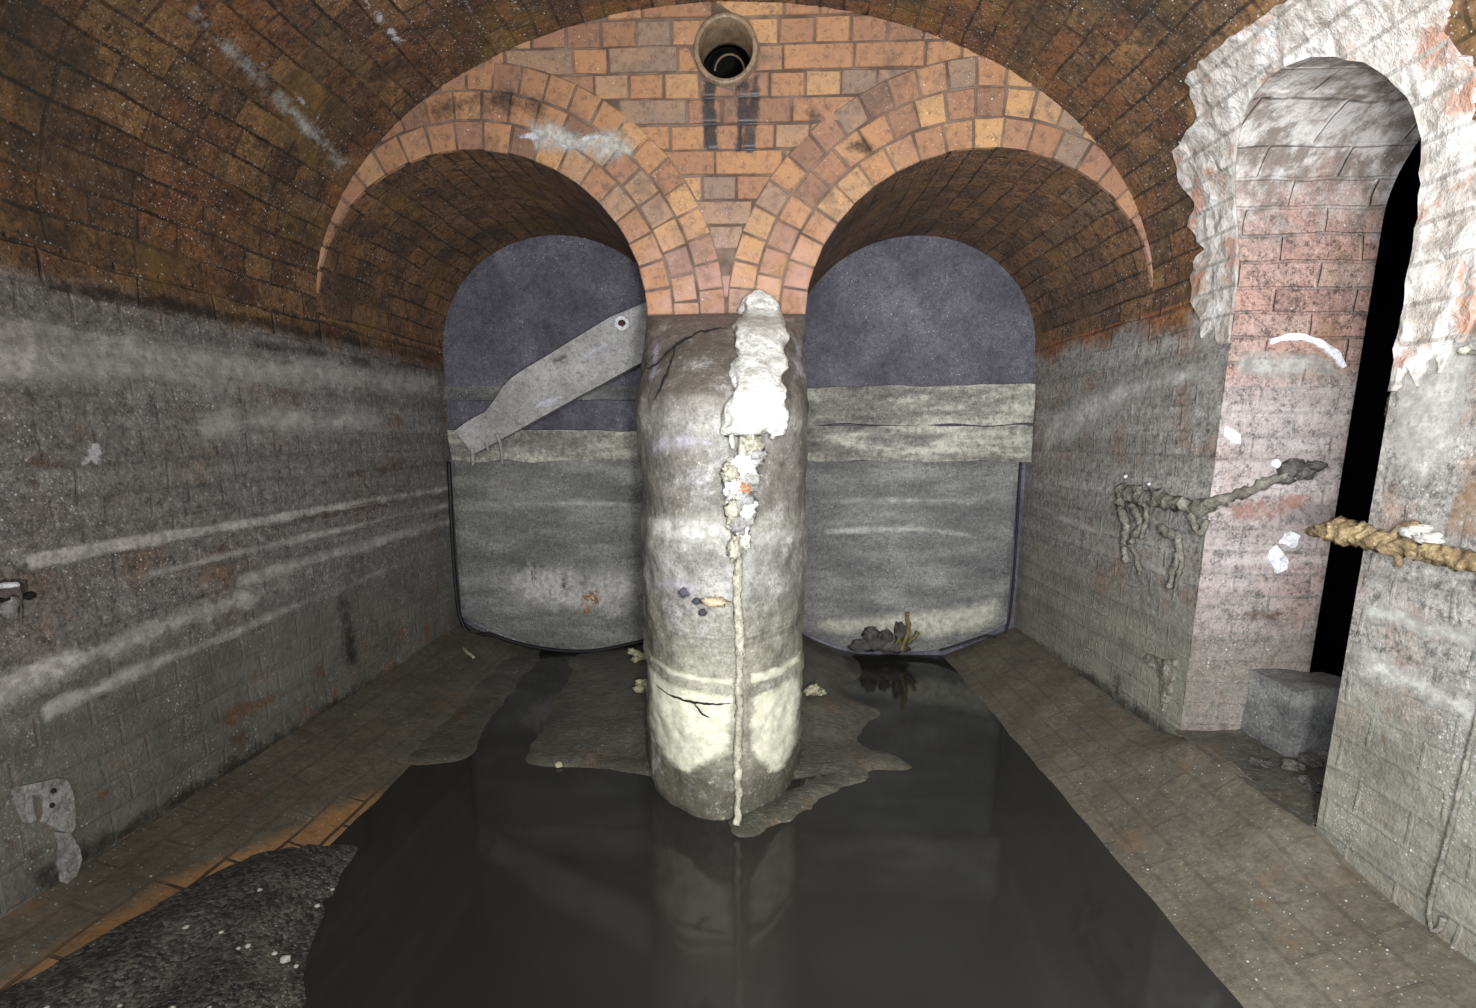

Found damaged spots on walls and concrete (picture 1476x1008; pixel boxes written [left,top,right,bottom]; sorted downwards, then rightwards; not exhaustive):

efflorescence [520,122,633,161]
peeling [1172,0,1476,468]
water stain [0,486,450,720]
water stain [81,693,355,860]